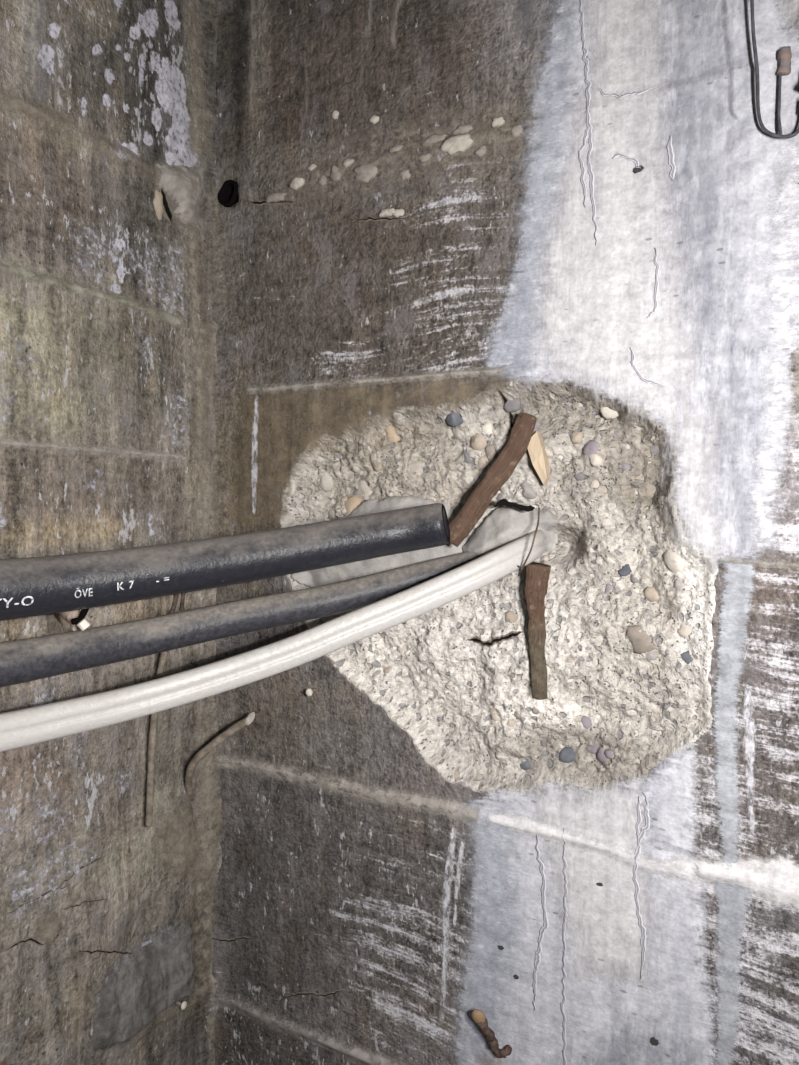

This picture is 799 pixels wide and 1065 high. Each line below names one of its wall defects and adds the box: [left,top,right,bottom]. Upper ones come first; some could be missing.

rust [449,412,536,547]
rust [524,562,551,700]
crack [633,792,650,980]